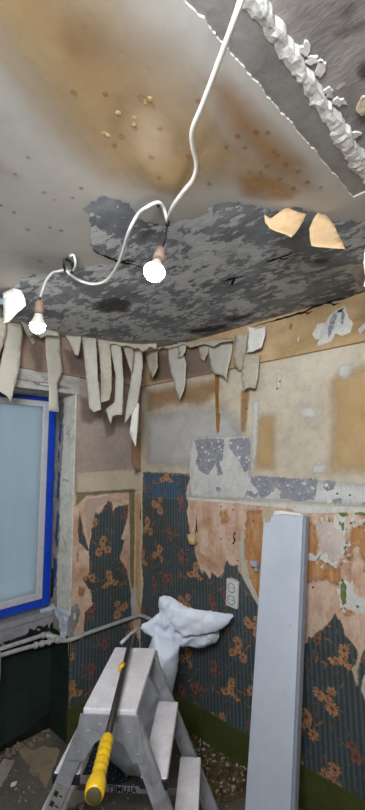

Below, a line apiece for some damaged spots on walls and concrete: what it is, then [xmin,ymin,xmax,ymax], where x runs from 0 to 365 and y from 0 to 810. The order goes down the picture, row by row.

leakage [0,0,291,197]
peeling [299,39,326,78]
peeling [323,86,365,116]
peeling [0,196,365,345]
flaking render [67,490,141,649]
flaking render [186,437,365,662]